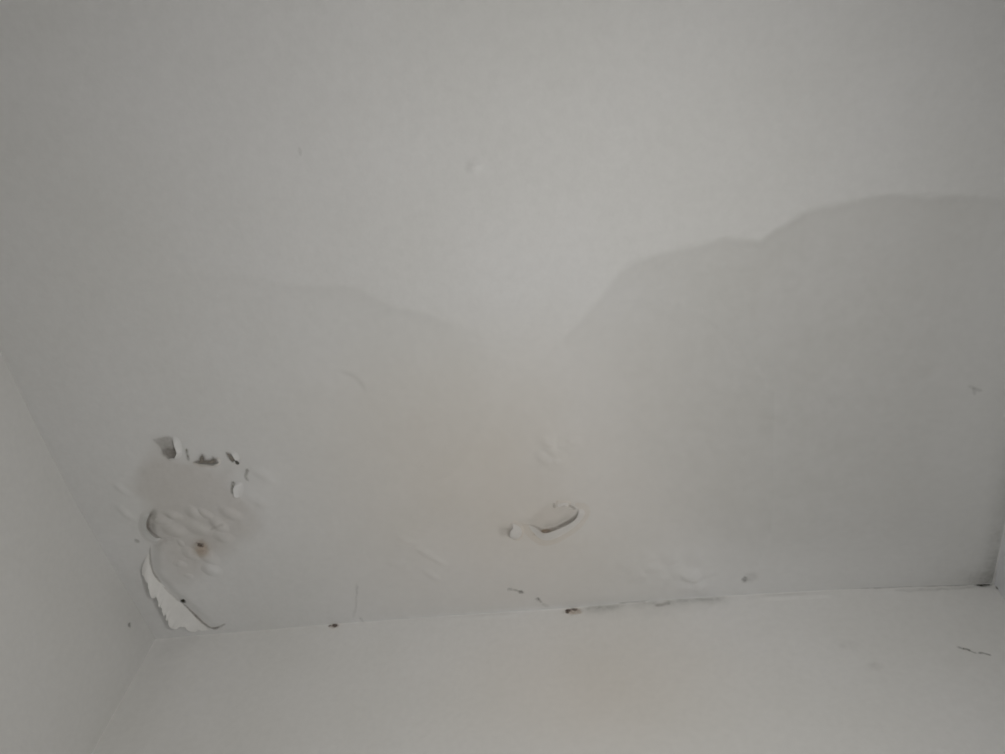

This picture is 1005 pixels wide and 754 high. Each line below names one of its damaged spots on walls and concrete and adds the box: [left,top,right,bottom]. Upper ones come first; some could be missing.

peeling [141,553,215,632]